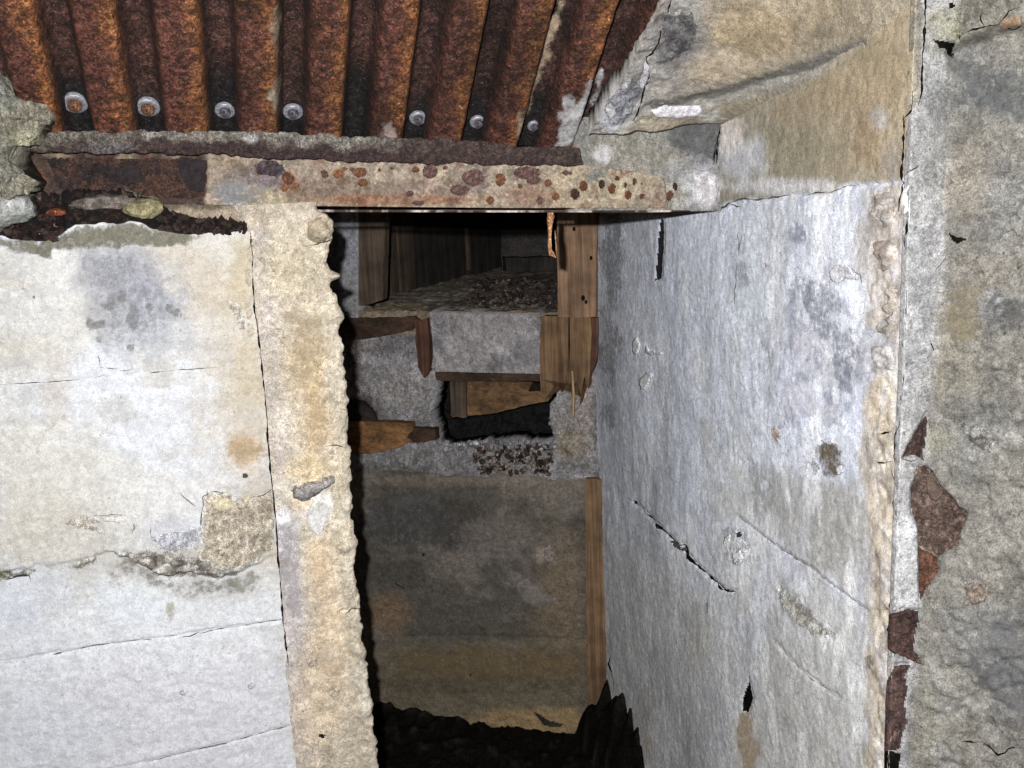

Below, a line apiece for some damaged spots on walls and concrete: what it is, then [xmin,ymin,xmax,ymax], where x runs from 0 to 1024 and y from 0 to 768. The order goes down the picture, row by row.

crack [621,1,671,121]
crack [893,0,927,246]
corrosion [280,172,300,192]
corrosion [317,158,395,187]
corrosion [412,164,448,179]
corrosion [450,166,645,205]
crack [53,232,321,663]
crack [876,373,968,518]
spalling [115,490,275,579]
crack [630,499,736,592]